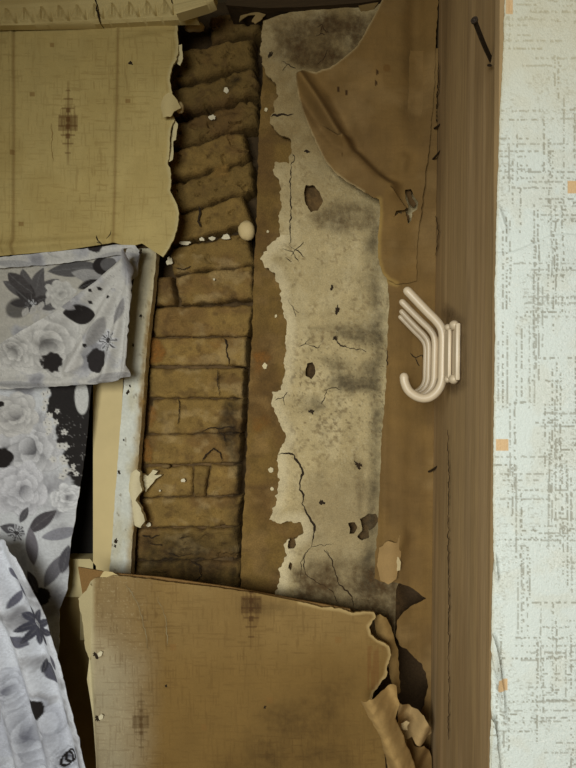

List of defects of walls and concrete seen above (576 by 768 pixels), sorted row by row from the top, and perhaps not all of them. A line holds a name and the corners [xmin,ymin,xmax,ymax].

peeling [169,120,178,162]
spalling [304,186,323,212]
spalling [240,67,304,595]
spalling [306,362,315,379]
crack [279,452,354,606]
spalling [348,514,378,540]